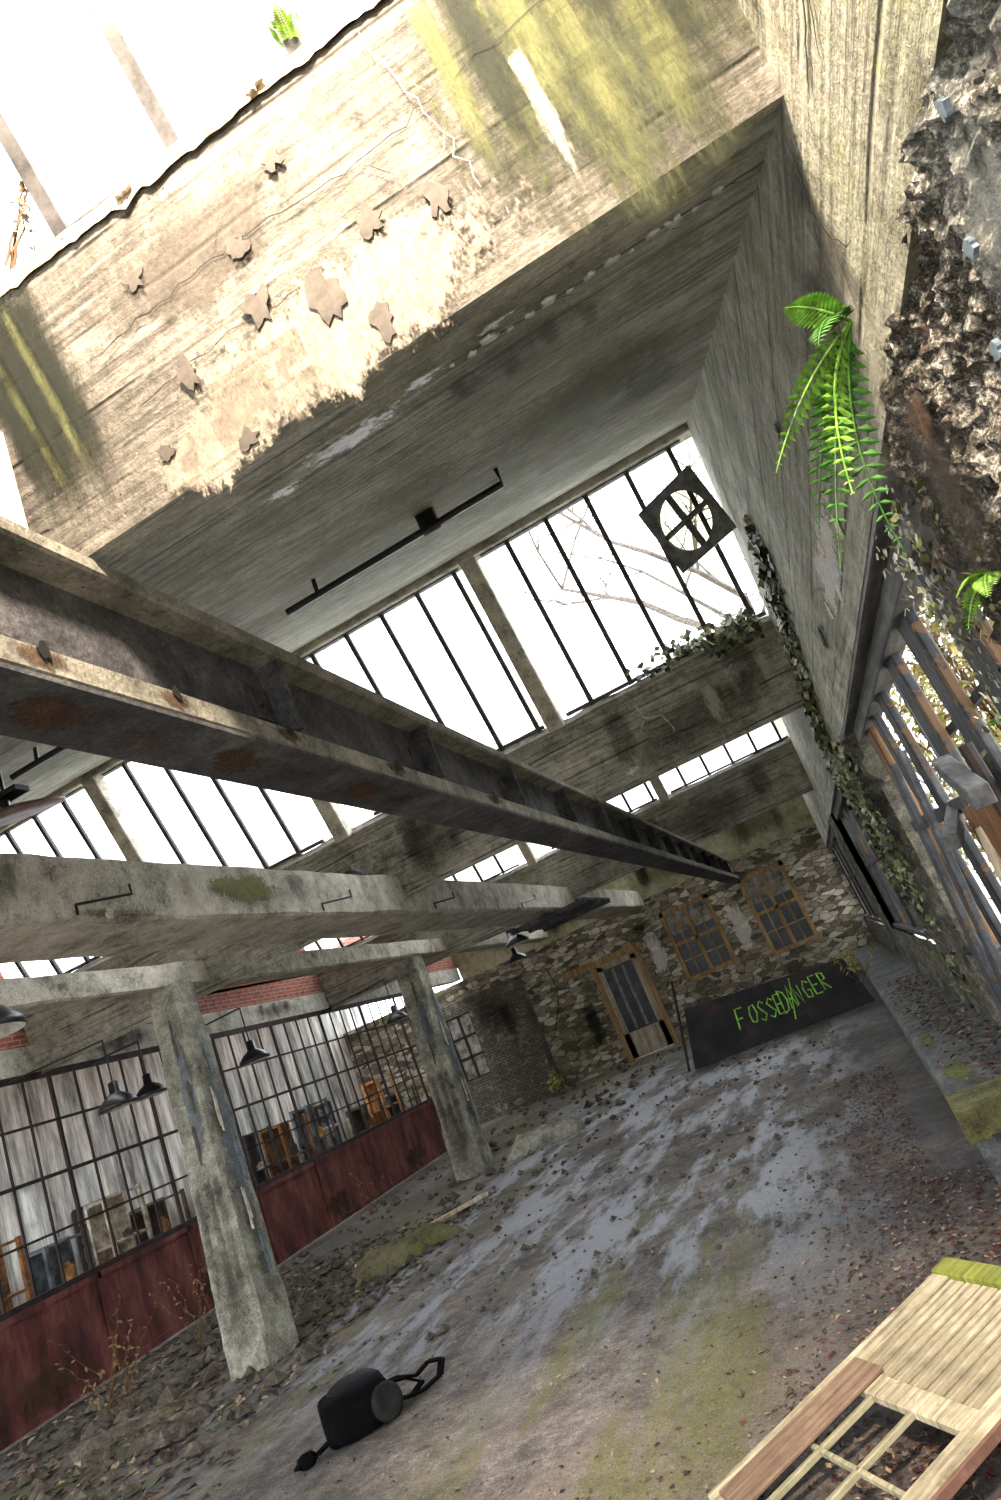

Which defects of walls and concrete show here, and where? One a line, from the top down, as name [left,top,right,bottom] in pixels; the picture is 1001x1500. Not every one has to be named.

damp [0,282,105,498]
peeling [97,144,285,328]
crack [135,287,300,411]
crack [100,0,541,356]
peeling [156,178,536,497]
damp [410,0,755,227]
damp [187,871,282,904]